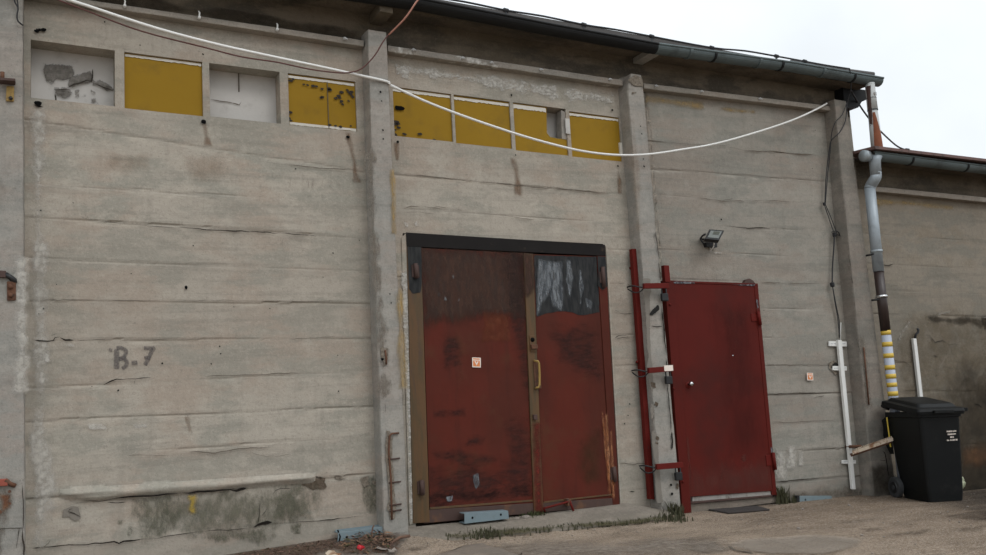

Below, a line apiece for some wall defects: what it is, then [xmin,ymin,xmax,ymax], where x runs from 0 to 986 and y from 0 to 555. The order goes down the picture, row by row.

spalling [44,64,114,105]
spalling [301,476,345,490]